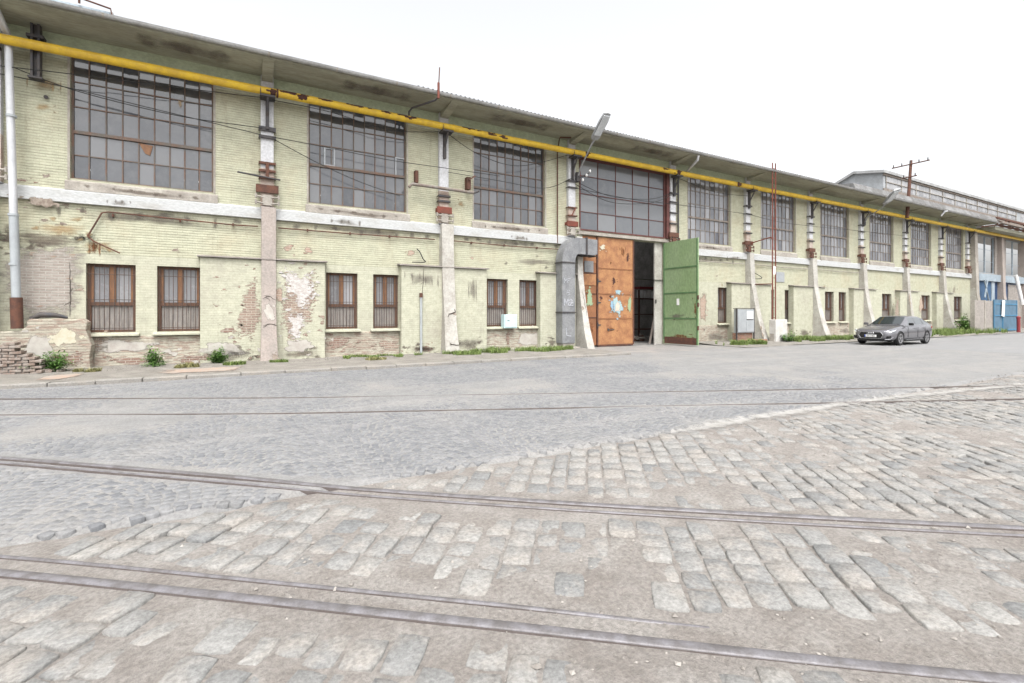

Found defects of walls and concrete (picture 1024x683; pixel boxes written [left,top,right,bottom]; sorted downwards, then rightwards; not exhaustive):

flaking render [0,246,217,366]
flaking render [213,244,433,360]
peeling [609,290,631,320]